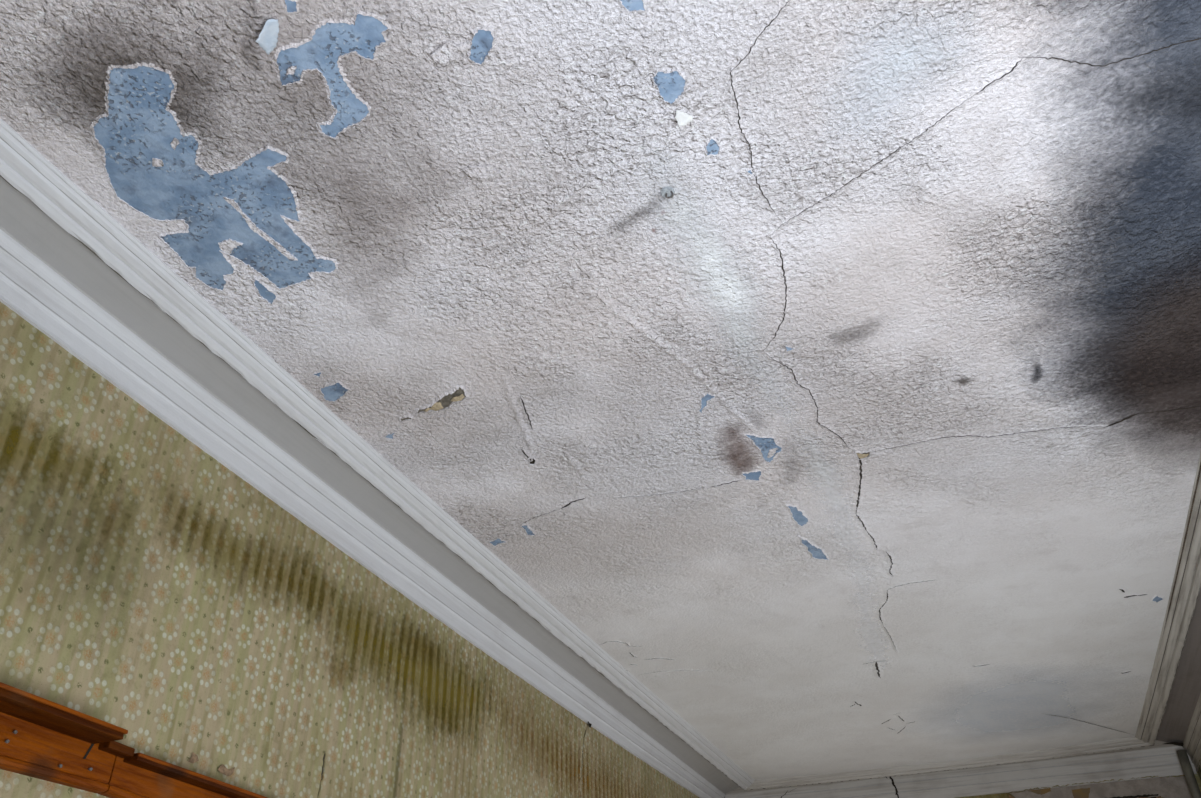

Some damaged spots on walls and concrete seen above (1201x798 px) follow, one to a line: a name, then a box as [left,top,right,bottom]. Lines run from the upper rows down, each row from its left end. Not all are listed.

damp [75,58,141,117]
peeling [255,0,392,140]
peeling [431,26,497,68]
peeling [650,67,693,127]
peeling [89,61,339,305]
damp [1059,0,1201,448]
crack [725,0,1201,678]
damp [0,415,107,478]
crack [516,396,537,462]
crack [519,477,743,525]
damp [175,507,491,735]
spalling [1007,775,1192,798]